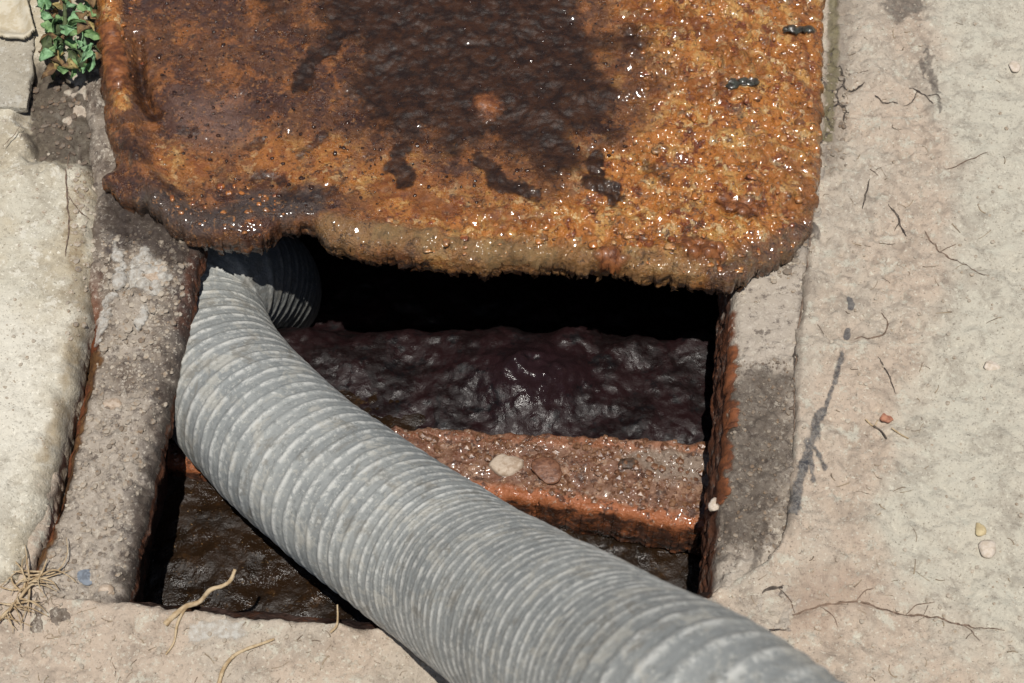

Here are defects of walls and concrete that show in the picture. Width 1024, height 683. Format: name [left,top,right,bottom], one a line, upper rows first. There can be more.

corrosion [37,351,104,568]
corrosion [716,345,740,505]
leakage [789,352,844,515]
crack [762,585,1005,641]